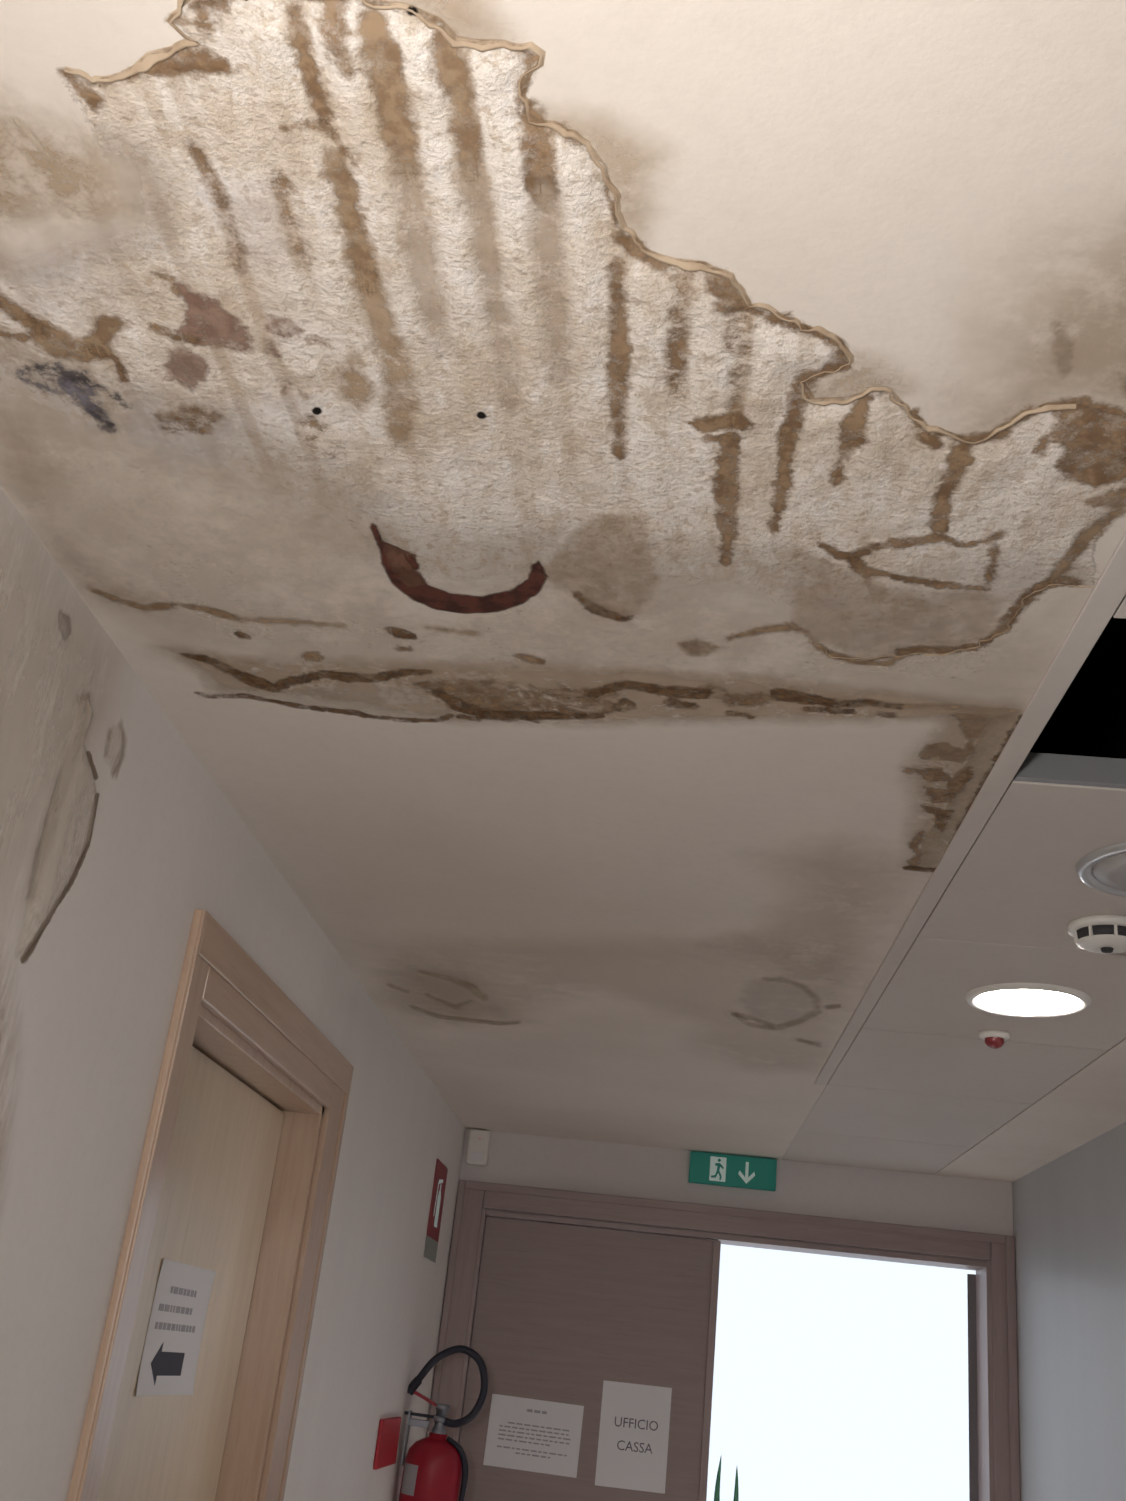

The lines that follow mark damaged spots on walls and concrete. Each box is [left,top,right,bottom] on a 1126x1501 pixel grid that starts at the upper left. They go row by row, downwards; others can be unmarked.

damp [0,119,103,213]
peeling [0,0,1126,666]
mould [17,363,124,433]
rust [370,524,547,614]
damp [574,592,633,621]
peeling [182,653,1022,872]